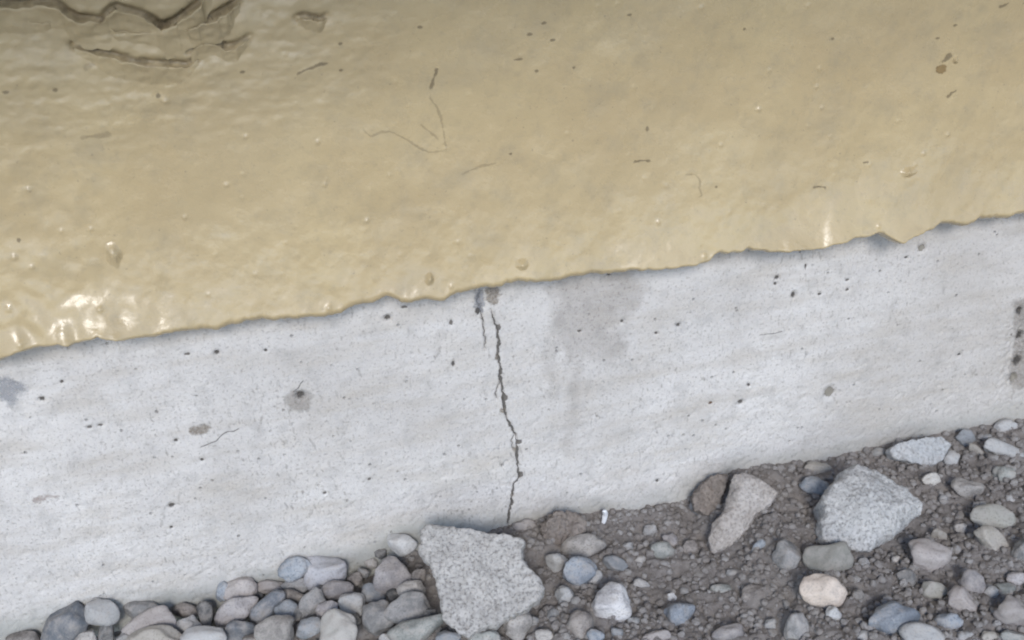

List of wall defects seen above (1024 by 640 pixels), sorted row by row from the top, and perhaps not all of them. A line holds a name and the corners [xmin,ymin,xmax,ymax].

spalling [475,287,499,314]
crack [478,295,523,523]